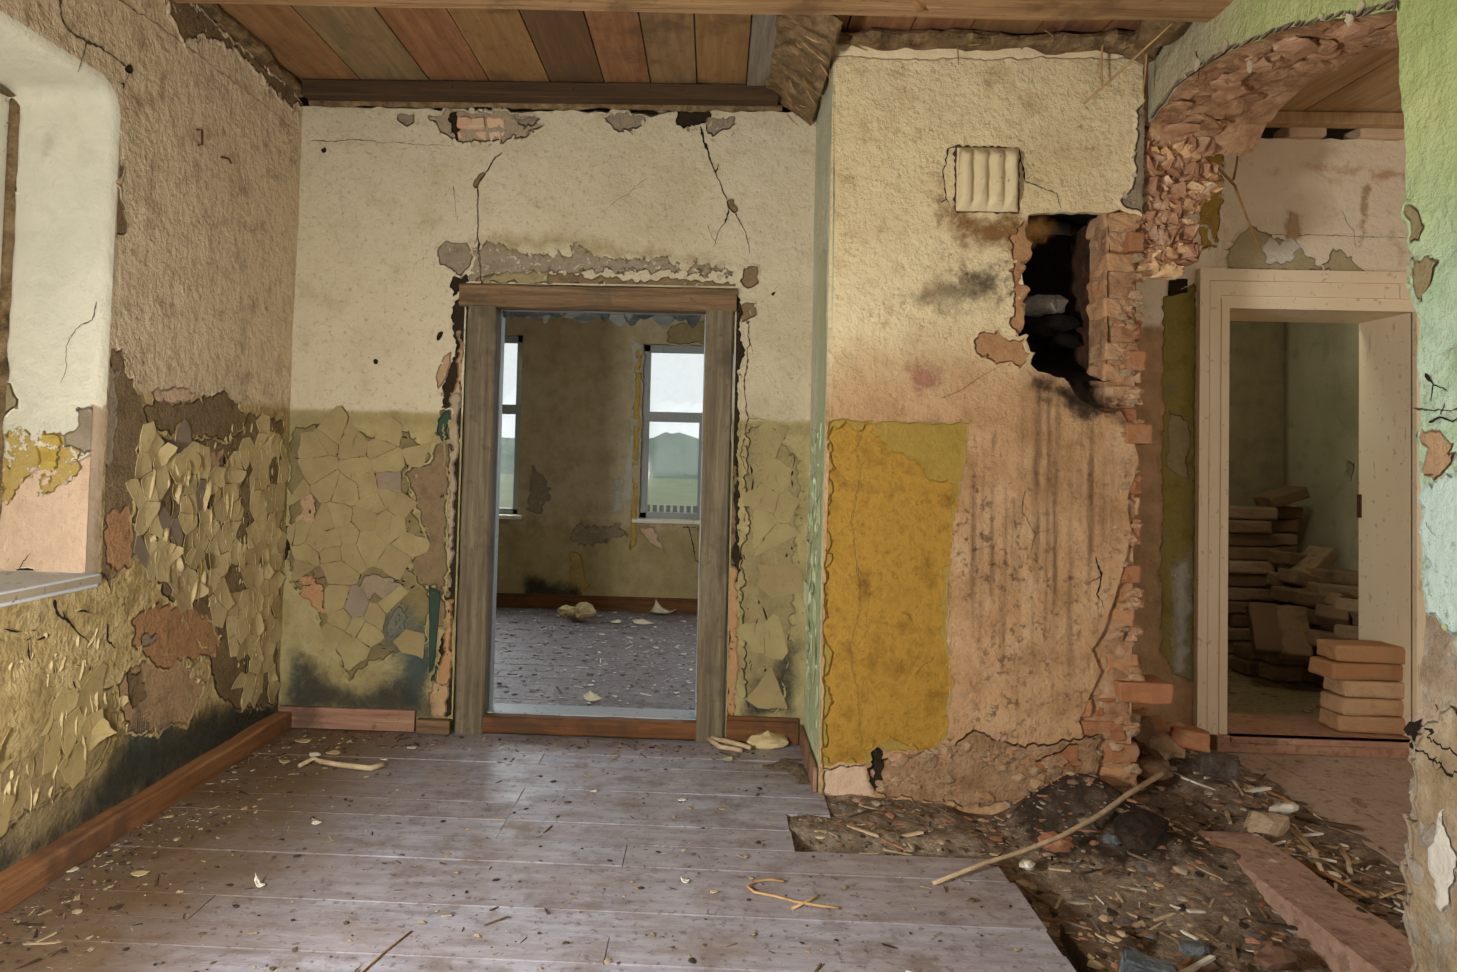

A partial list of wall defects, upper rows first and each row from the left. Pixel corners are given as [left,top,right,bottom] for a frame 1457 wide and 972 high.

crack [59,0,134,82]
crack [119,0,445,146]
flaking render [396,108,547,149]
crack [453,152,502,284]
crack [700,126,750,252]
peeling [834,44,1131,62]
crack [61,302,97,381]
spalling [1086,0,1399,683]
peeling [0,221,1174,847]
peeling [1415,421,1457,636]
water stain [38,706,270,846]
flaking render [1399,699,1457,972]